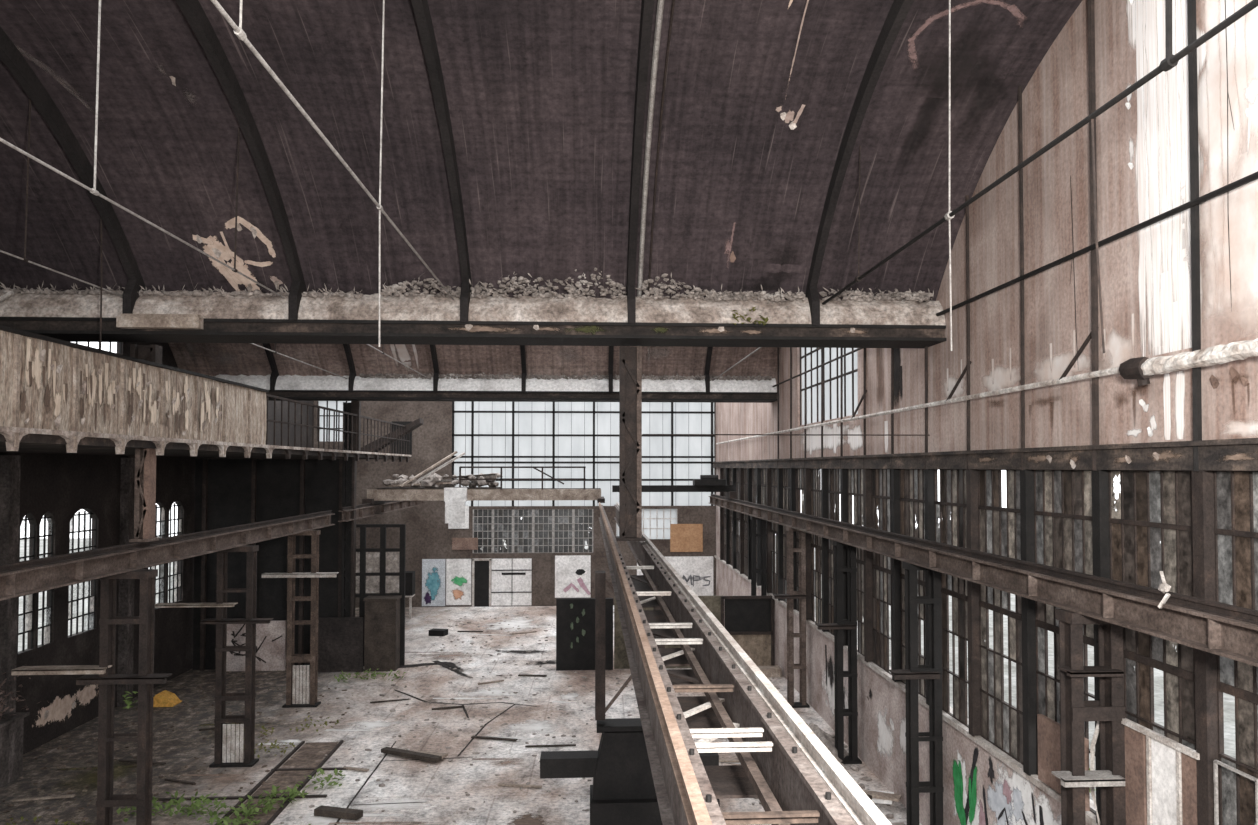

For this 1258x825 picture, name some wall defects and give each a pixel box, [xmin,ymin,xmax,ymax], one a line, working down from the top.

peeling [788,0,809,82]
peeling [776,98,805,130]
damp [1035,0,1258,386]
peeling [193,216,283,292]
peeling [20,338,222,437]
damp [983,348,1021,391]
peeling [32,685,99,728]